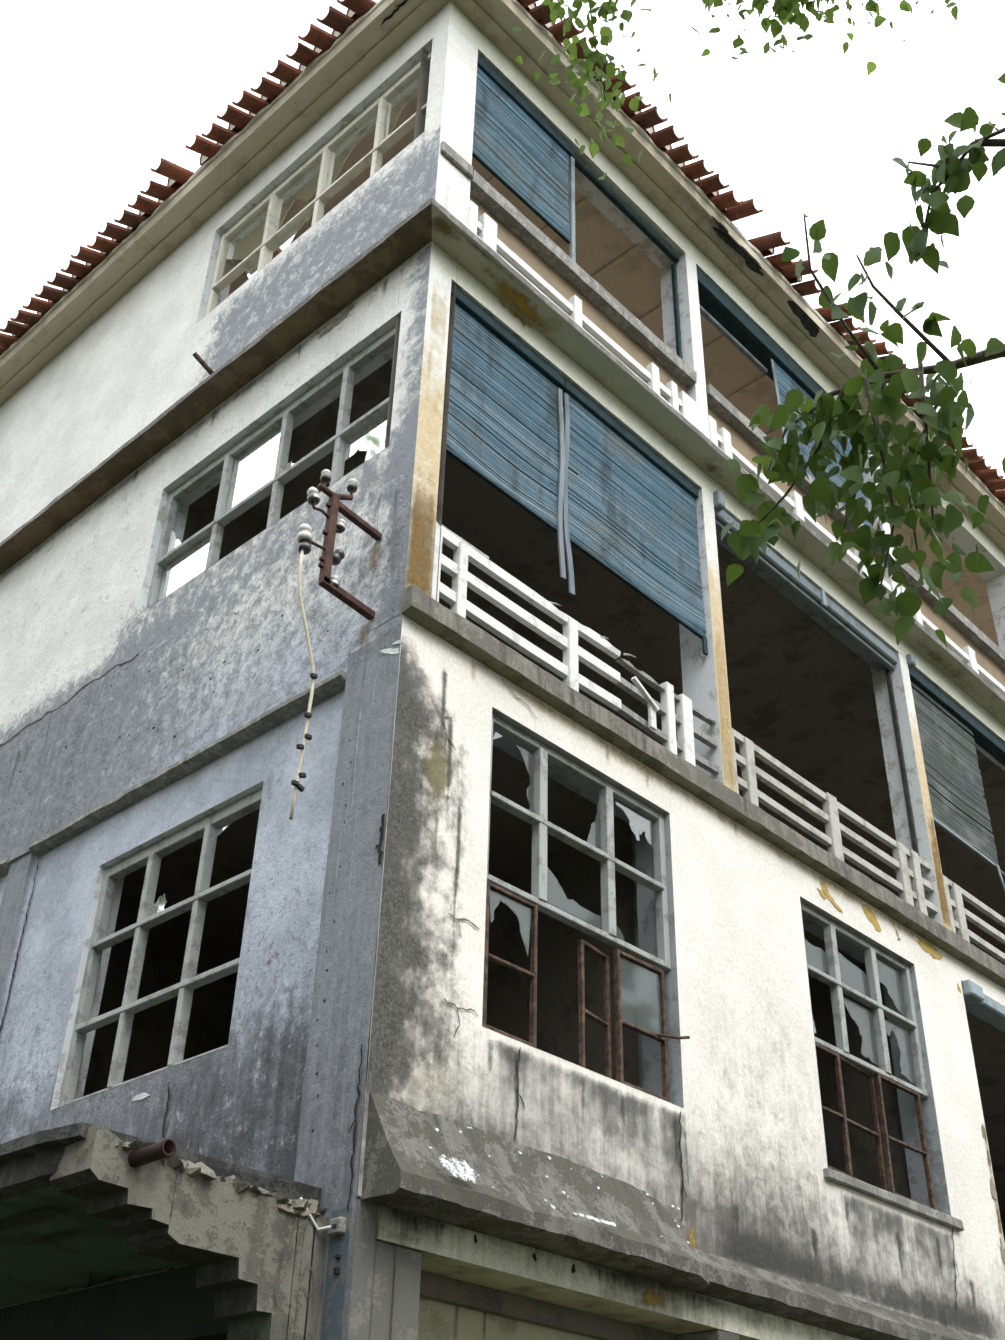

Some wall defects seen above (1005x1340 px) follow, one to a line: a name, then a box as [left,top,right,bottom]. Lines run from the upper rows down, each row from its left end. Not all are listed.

damp [366,645,461,1097]
crack [514,1047,525,1140]
peeling [429,1147,479,1183]
damp [723,1197,996,1338]